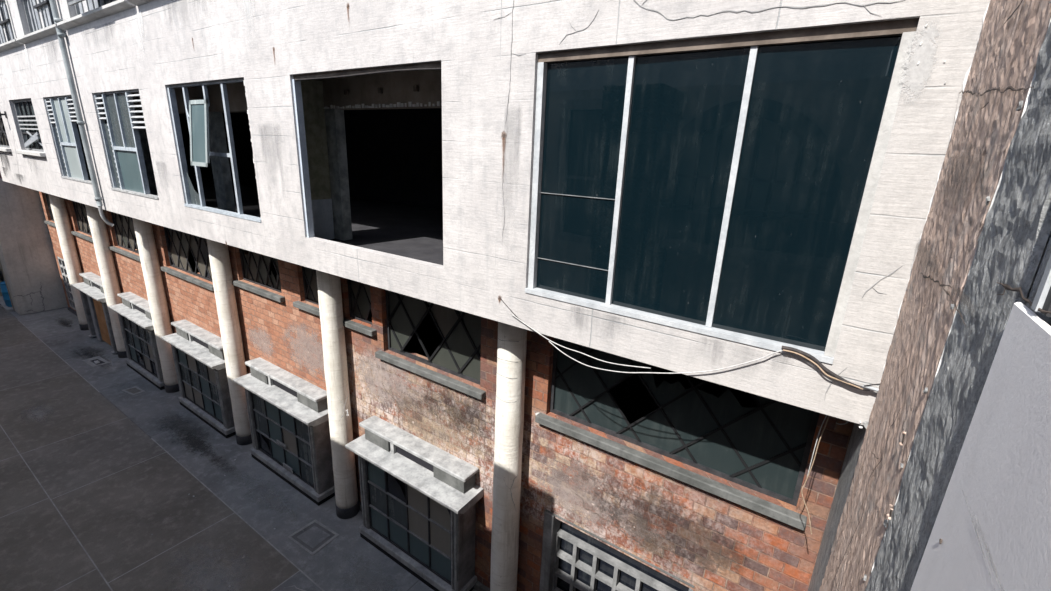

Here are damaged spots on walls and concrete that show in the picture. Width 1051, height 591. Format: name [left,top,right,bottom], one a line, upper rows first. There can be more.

crack [634,0,903,21]
crack [959,86,1033,129]
crack [862,265,965,324]